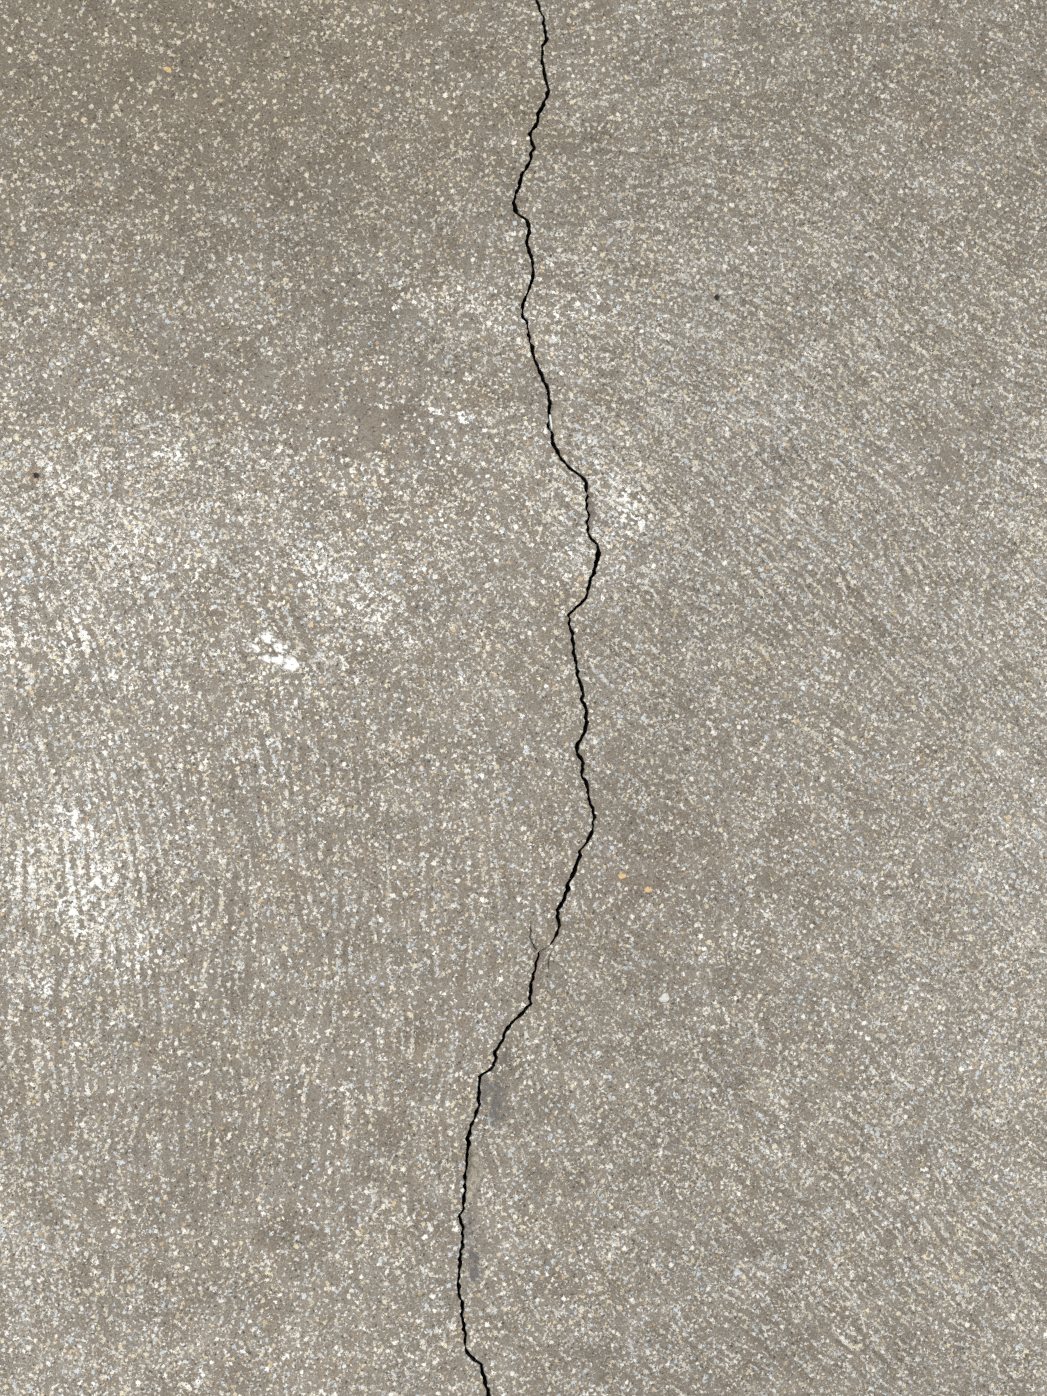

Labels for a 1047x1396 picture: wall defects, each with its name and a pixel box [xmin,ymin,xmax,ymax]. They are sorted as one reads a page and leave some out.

crack [456,0,601,1396]